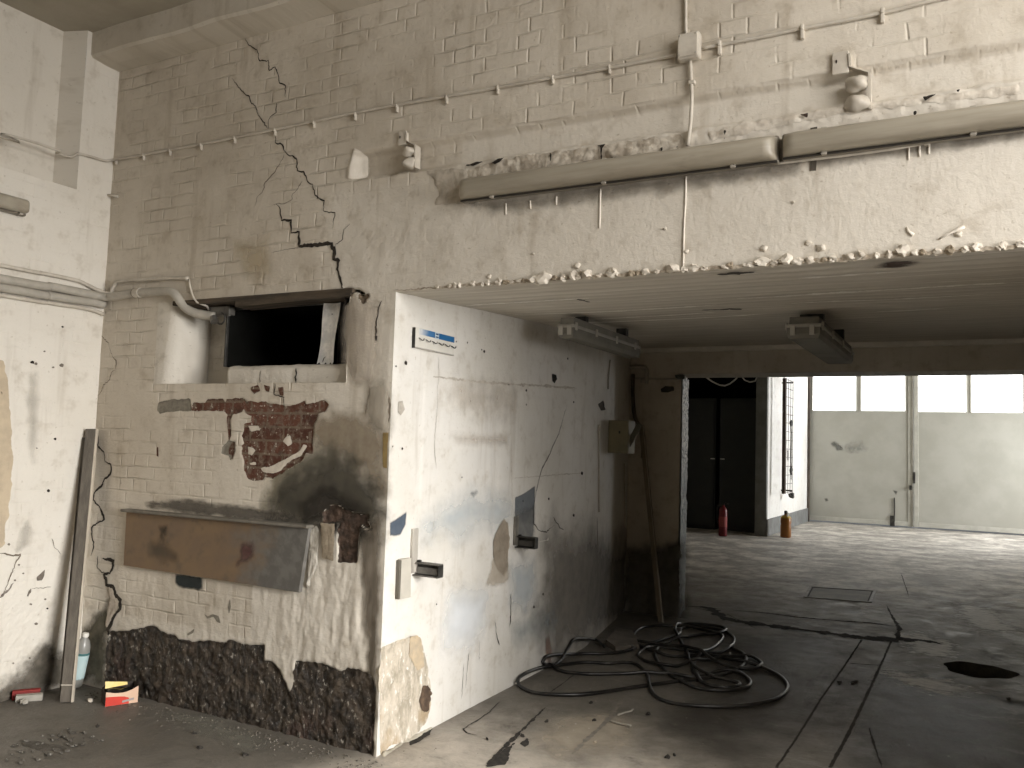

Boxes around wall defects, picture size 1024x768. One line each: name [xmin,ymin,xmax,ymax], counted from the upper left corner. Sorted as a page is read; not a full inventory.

crack [233,39,344,288]
spalling [427,134,687,205]
peeling [157,385,329,481]
crack [91,437,122,637]
spalling [306,505,370,588]
crack [688,574,941,644]
spalling [104,587,432,756]